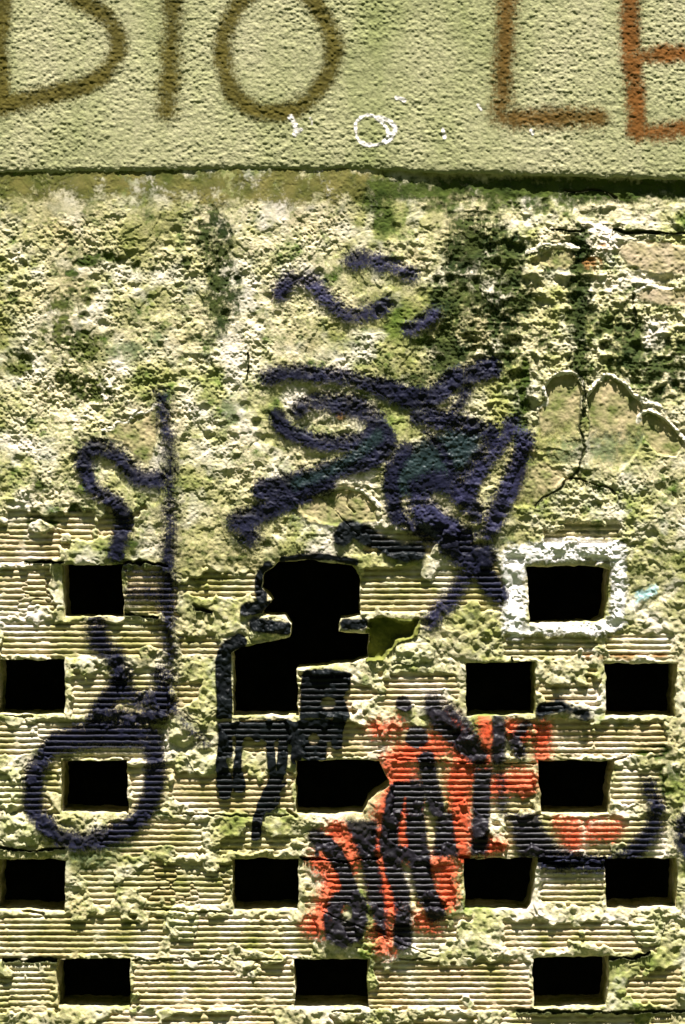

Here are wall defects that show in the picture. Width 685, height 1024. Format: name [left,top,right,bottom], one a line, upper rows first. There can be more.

water stain [402,211,533,446]
water stain [538,334,553,354]
water stain [565,226,685,403]
peeling [298,486,381,527]
crack [535,385,620,507]
spalling [365,617,422,662]